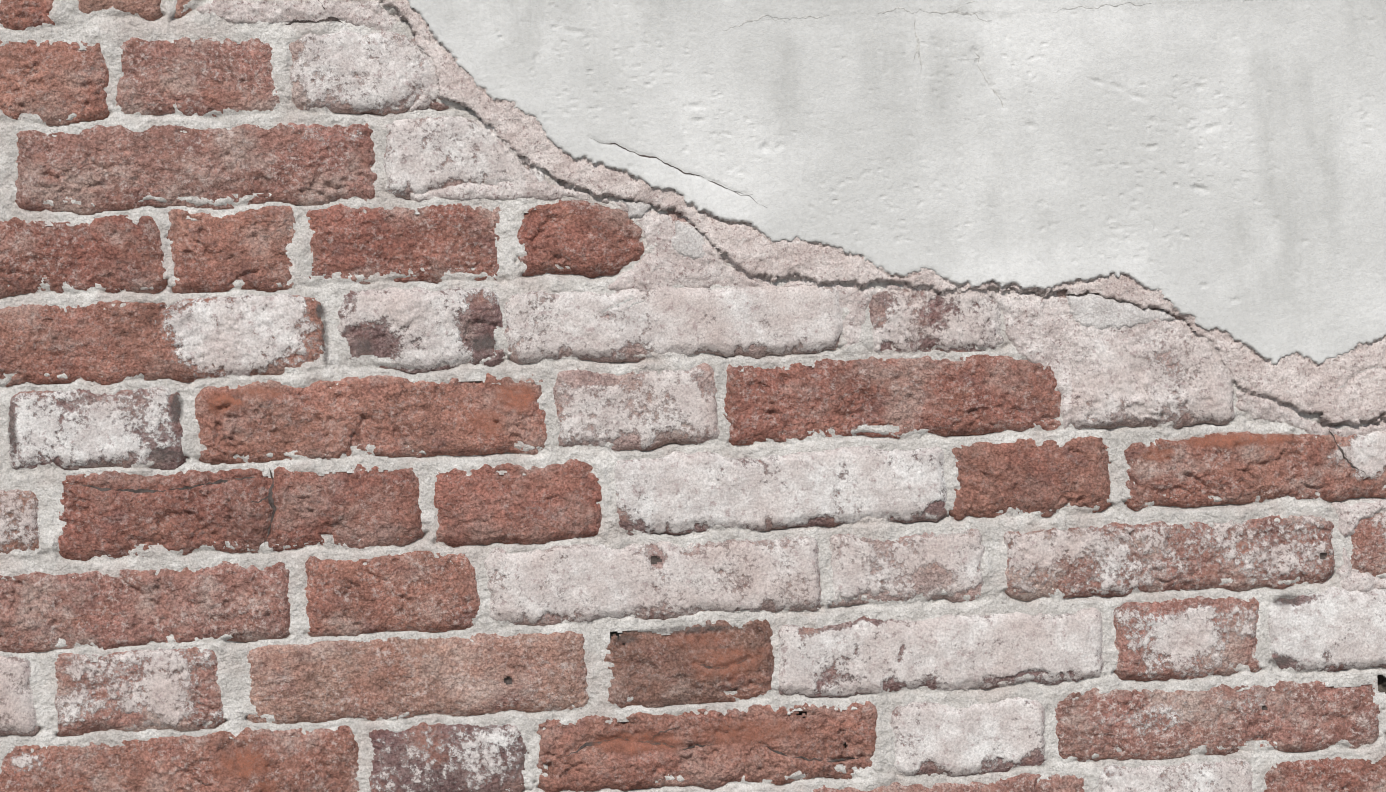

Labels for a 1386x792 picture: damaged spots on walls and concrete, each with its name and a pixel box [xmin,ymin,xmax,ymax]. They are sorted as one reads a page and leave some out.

crack [591,138,757,203]
flaking render [383,0,1386,425]
peeling [337,286,500,372]
peeling [1371,512,1386,541]
spalling [1377,675,1386,693]
peeling [12,752,41,771]